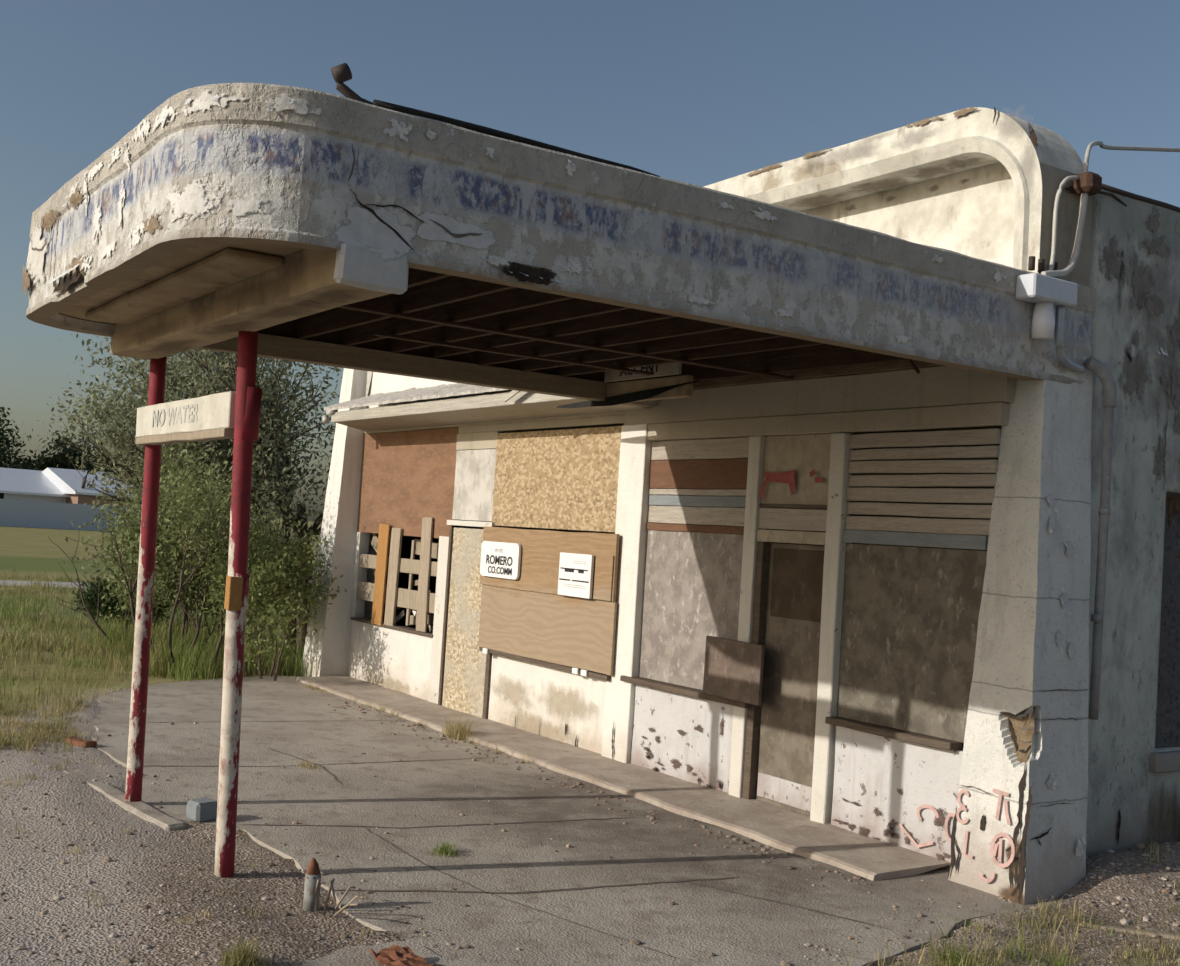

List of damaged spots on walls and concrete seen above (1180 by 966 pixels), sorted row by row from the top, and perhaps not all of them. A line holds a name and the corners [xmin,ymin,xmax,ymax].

peeling [259,93,325,117]
peeling [40,89,274,293]
crack [347,145,484,251]
peeling [743,162,781,177]
peeling [334,204,593,286]
peeling [1100,229,1126,308]
peeling [1119,302,1180,400]
peeling [641,728,722,789]
peeling [832,798,911,844]
peeling [933,808,947,831]
crack [947,761,1071,904]